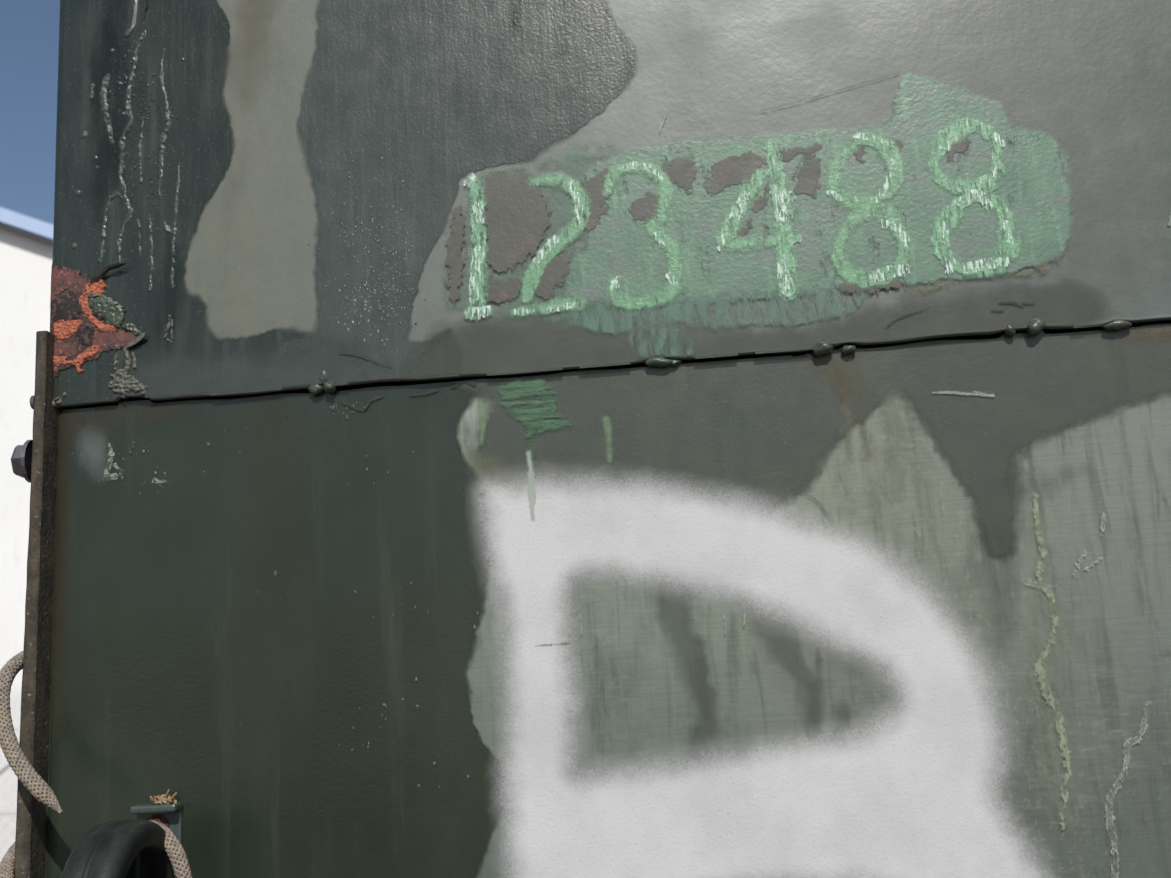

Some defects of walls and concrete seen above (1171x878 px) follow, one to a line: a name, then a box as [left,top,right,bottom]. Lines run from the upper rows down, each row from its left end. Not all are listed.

corrosion [50,263,146,377]